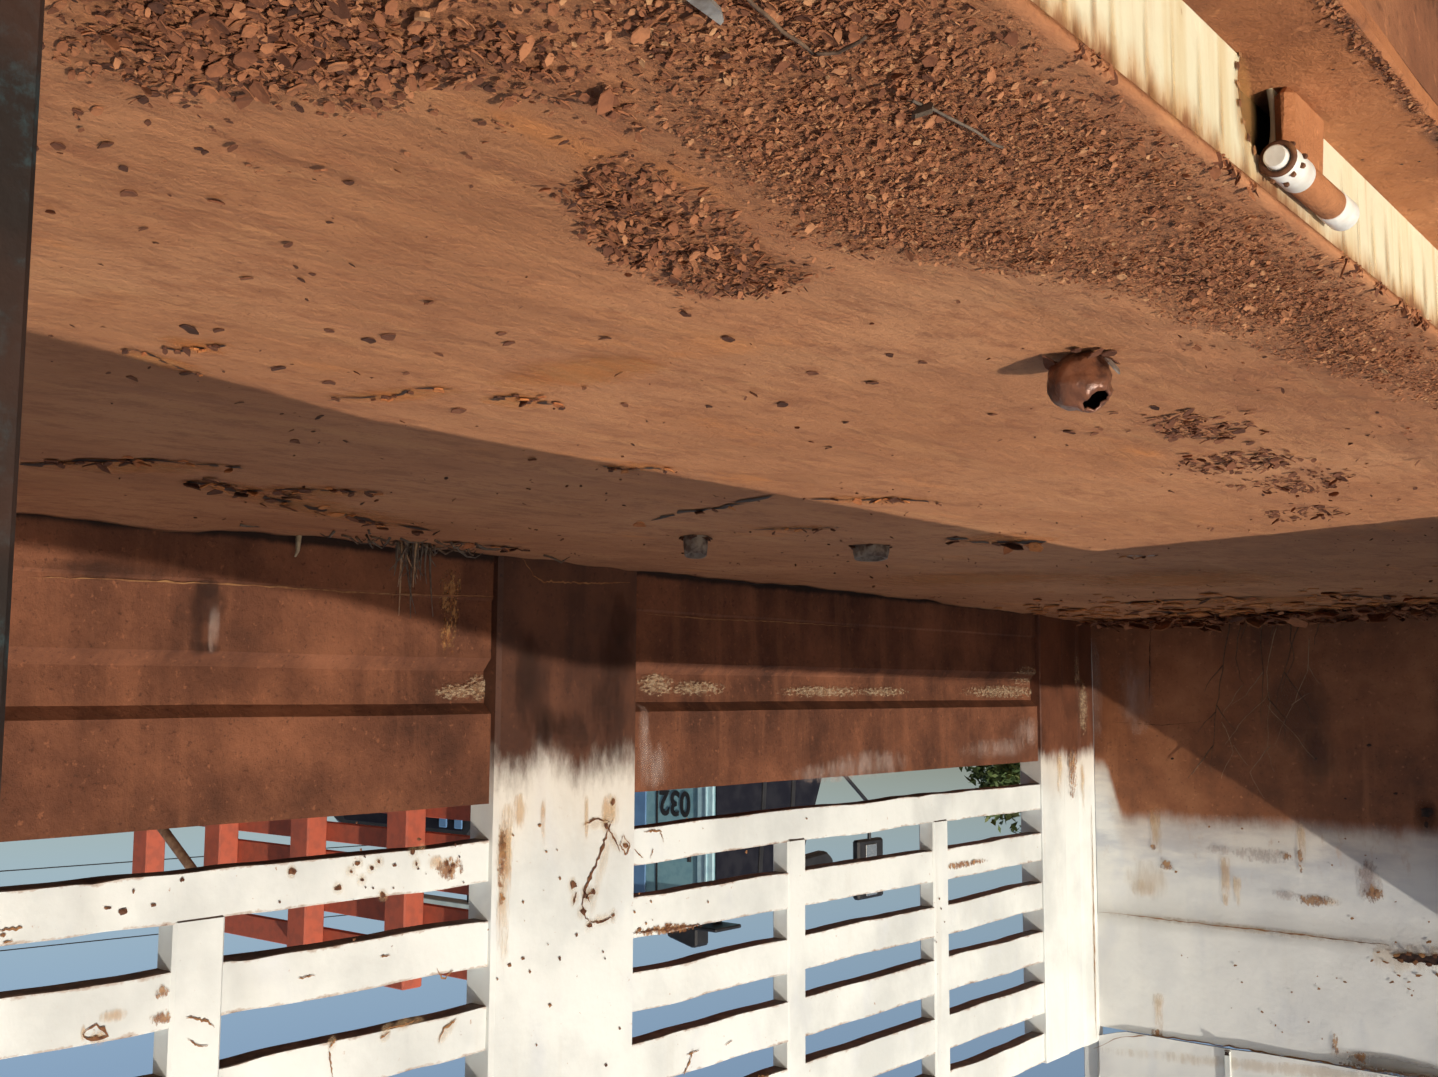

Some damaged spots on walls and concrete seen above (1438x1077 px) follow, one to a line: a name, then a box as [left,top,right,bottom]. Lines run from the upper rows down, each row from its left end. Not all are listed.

rust [1126,596,1290,618]
rust [334,848,397,901]